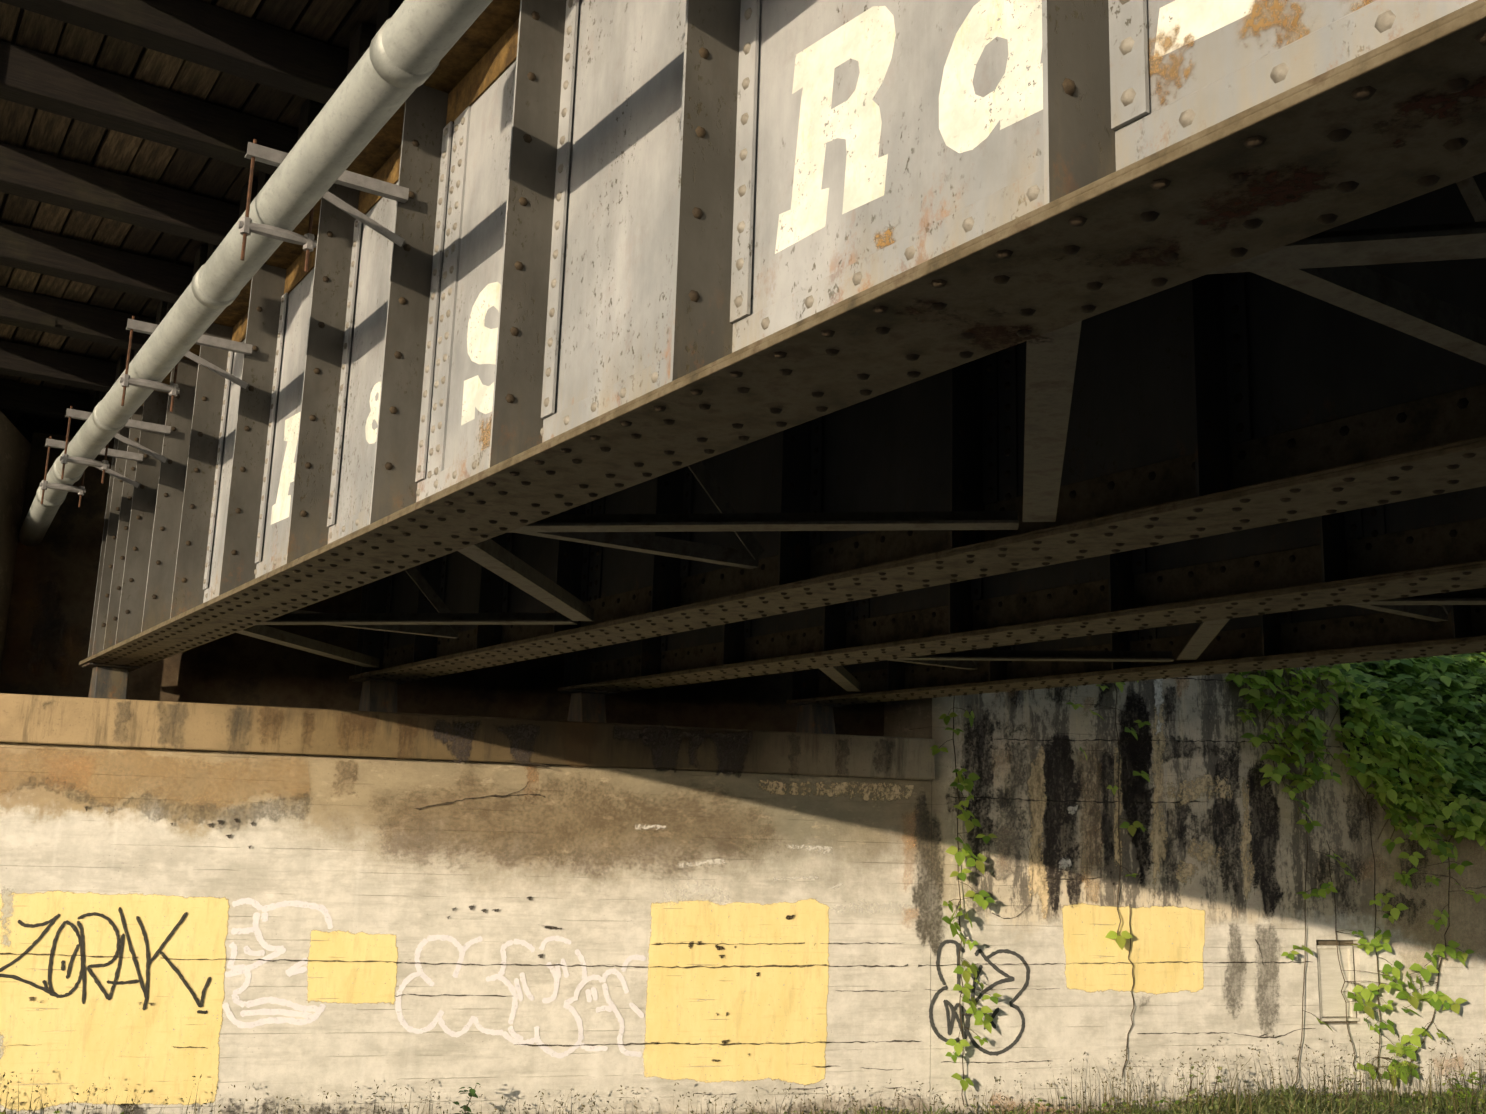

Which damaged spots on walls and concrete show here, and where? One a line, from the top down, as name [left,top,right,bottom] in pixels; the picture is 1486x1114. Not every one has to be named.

rust [1148,27,1193,104]
rust [1242,0,1309,44]
water stain [912,679,1284,1031]
water stain [1314,794,1377,913]